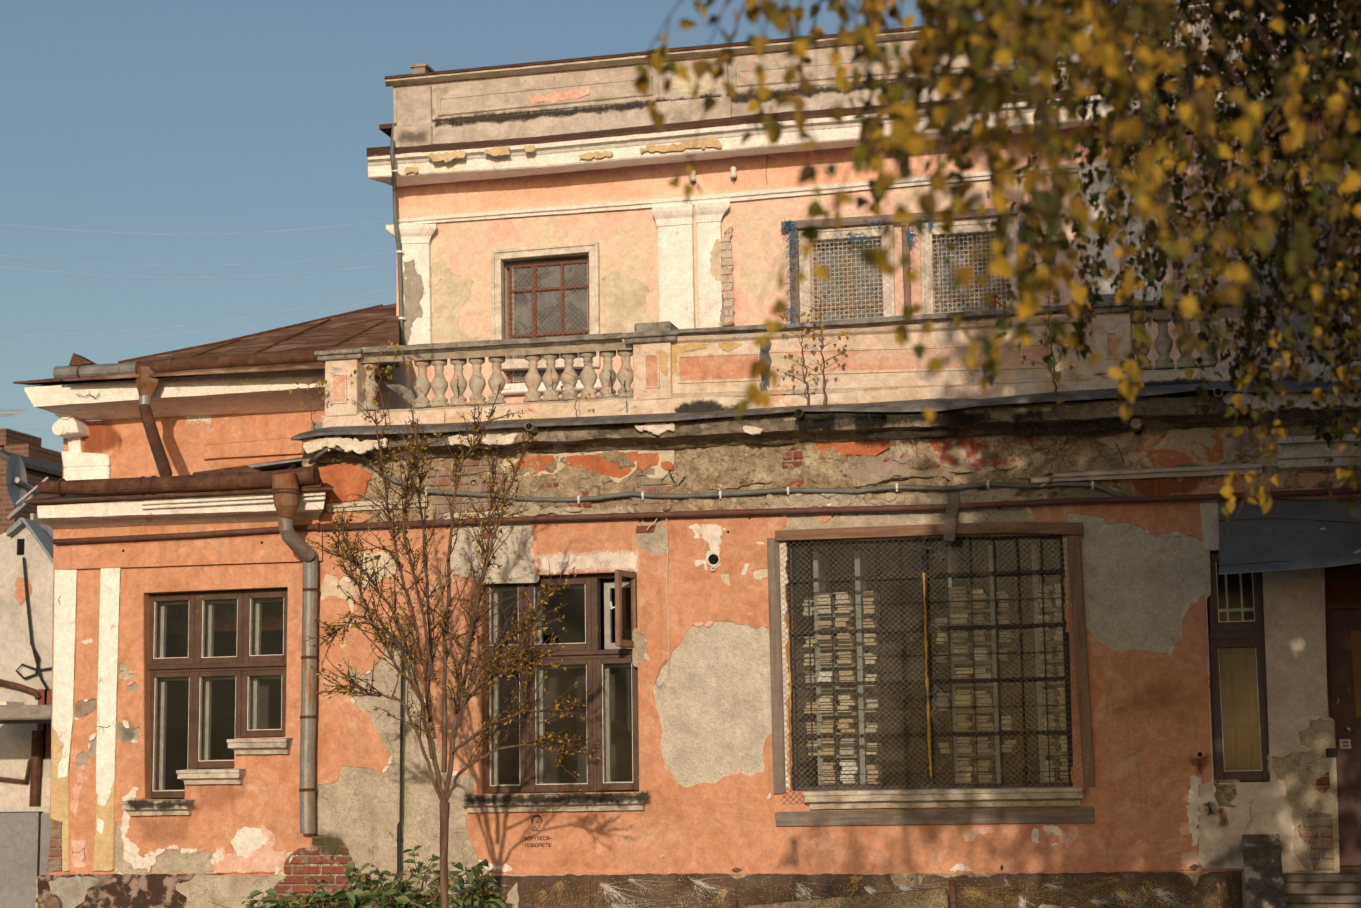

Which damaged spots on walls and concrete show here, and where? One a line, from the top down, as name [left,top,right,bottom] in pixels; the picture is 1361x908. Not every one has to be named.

peeling [402,257,491,345]
spalling [321,551,397,648]
spalling [397,443,1211,789]
spalling [46,639,519,908]
peeling [1179,775,1240,886]
spalling [1267,715,1340,873]